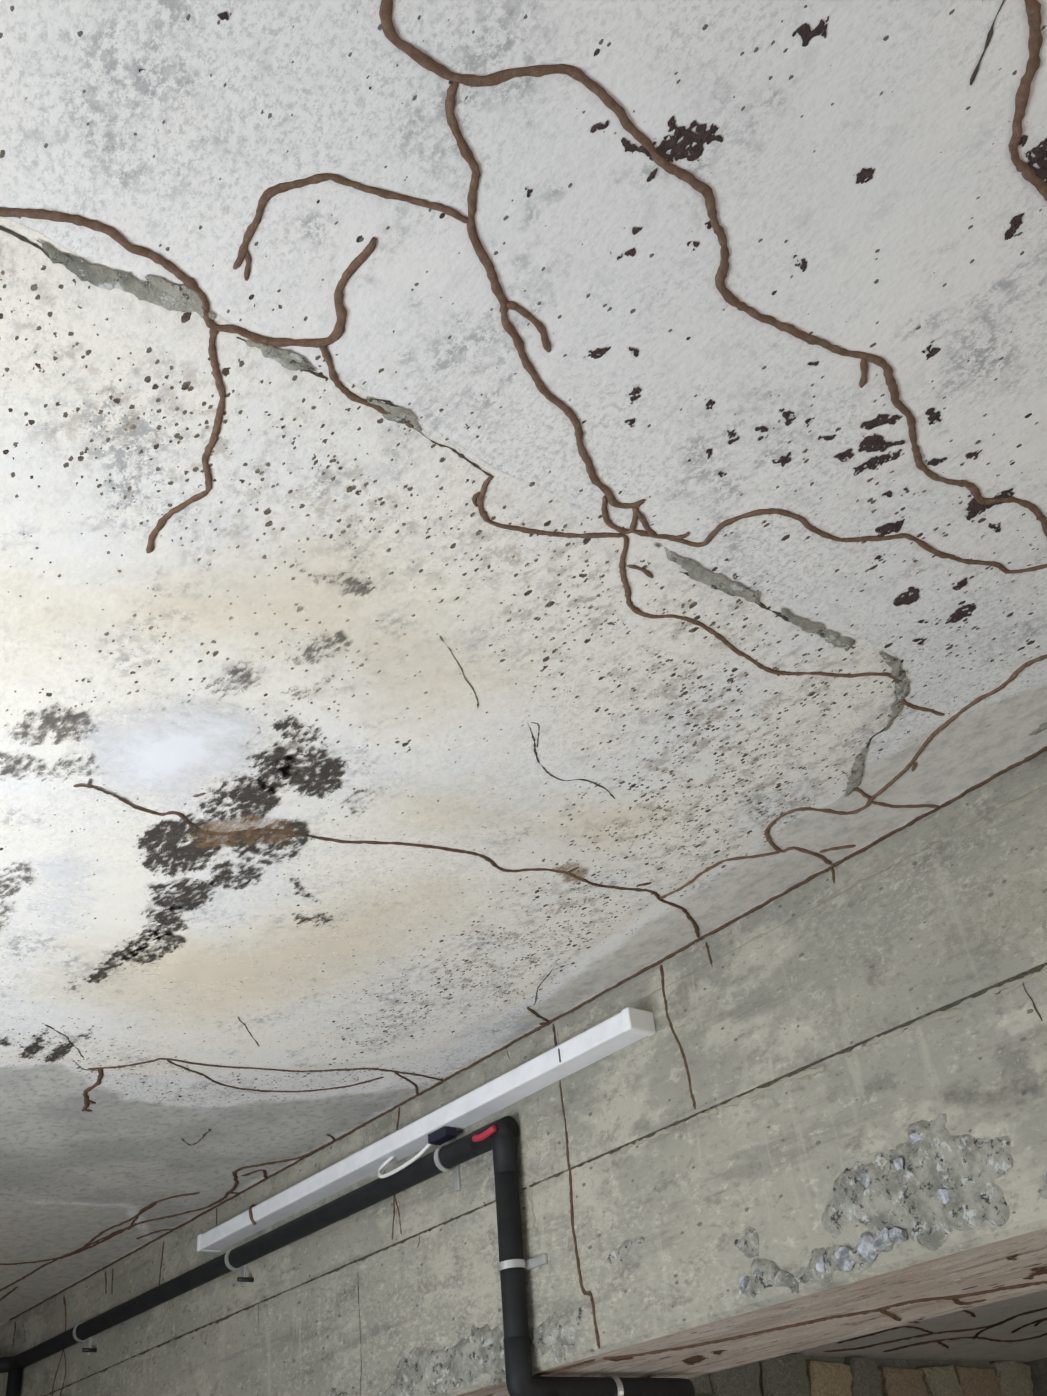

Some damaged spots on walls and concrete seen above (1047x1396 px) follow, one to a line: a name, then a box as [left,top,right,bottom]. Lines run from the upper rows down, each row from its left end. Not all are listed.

crack [970,0,1005,85]
crack [0,226,50,259]
crack [375,399,492,476]
peeling [875,519,905,537]
damp [297,565,375,596]
crack [744,597,790,622]
peeling [893,587,922,606]
peeling [945,578,977,624]
damp [293,631,353,665]
crack [528,722,615,799]
damp [0,662,372,992]
spalling [731,1113,1013,1299]